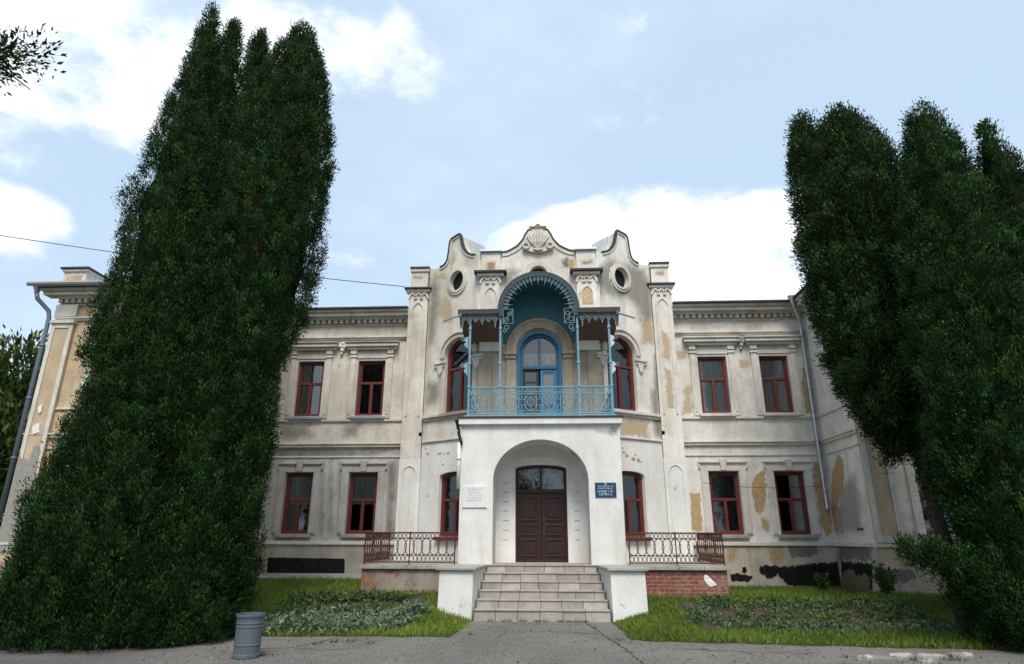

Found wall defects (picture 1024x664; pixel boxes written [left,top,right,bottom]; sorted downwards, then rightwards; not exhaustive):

flaking render [642,321,692,411]
flaking render [691,493,702,531]
flaking render [751,471,768,530]
flaking render [813,455,844,537]